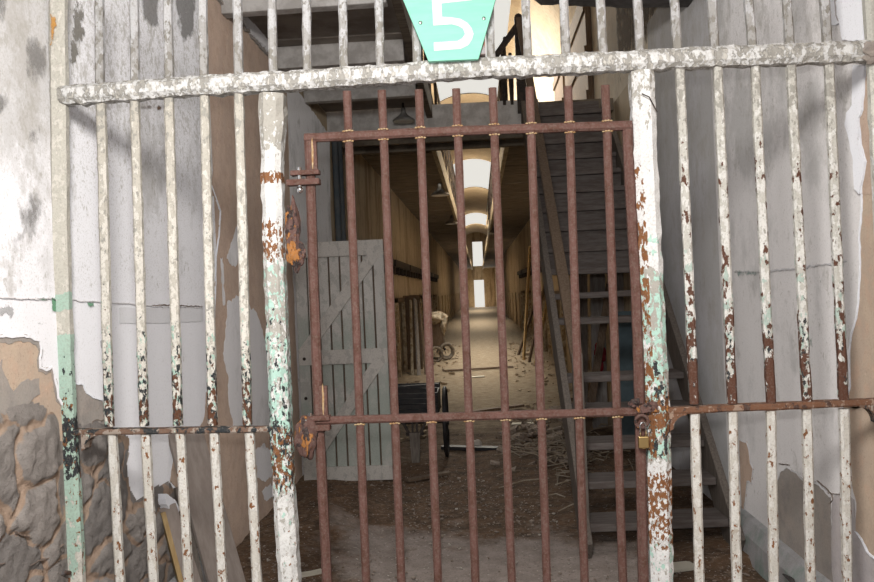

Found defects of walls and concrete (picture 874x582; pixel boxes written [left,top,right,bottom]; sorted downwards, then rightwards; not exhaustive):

damp [27,43,46,72]
flaking render [222,17,269,74]
damp [22,196,38,226]
flaking render [0,334,68,582]
flaking render [76,383,179,582]
flaking render [200,94,274,544]
flaking render [286,262,304,483]